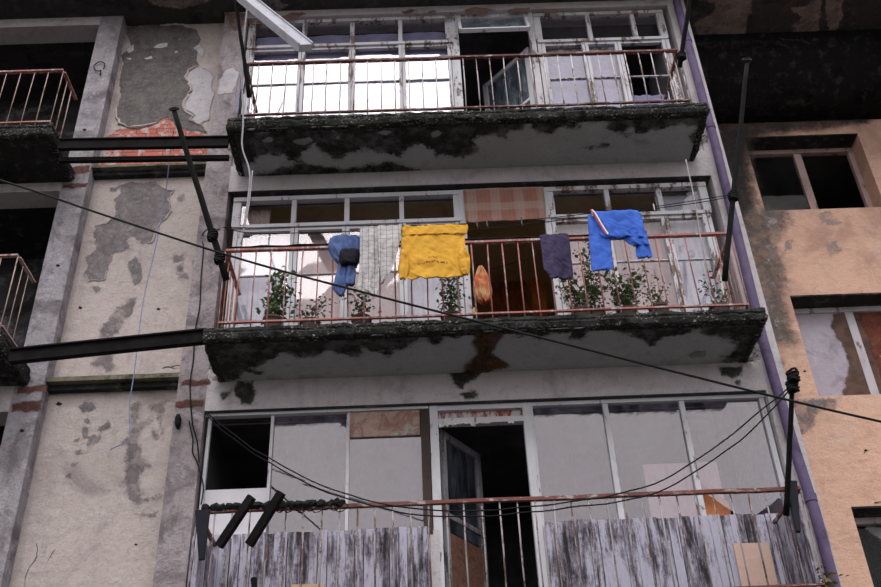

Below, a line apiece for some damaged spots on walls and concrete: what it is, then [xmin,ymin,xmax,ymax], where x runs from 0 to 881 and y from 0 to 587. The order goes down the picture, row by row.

peeling [693,0,752,35]
peeling [791,0,844,32]
spalling [108,23,239,137]
flaking render [101,149,208,165]
leakage [227,110,708,176]
peeling [84,181,182,293]
leakage [600,163,795,385]
leakage [207,327,482,405]
leakage [504,326,587,341]
leakage [122,404,160,503]